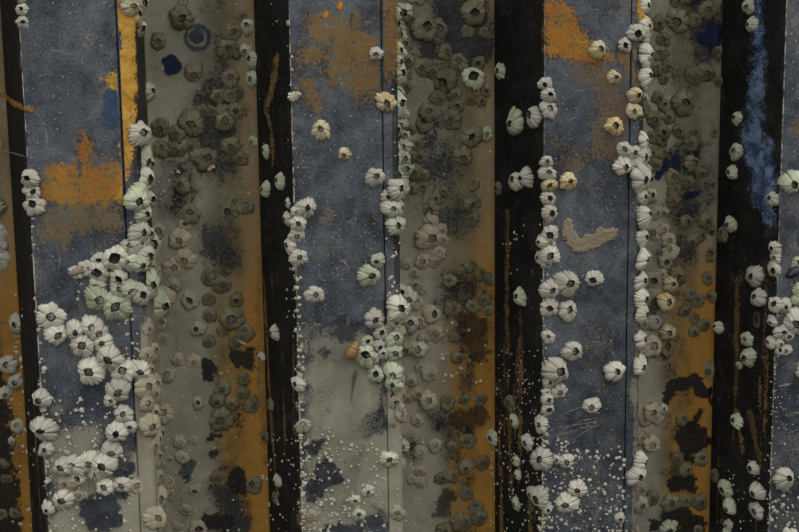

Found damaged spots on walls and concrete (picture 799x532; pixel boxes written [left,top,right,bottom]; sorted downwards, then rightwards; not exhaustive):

corrosion [540,0,640,87]
corrosion [36,0,139,252]
peeling [330,314,364,344]
peeling [112,462,135,479]
peeling [304,438,344,503]
peeling [78,491,130,532]
peeling [322,513,384,532]